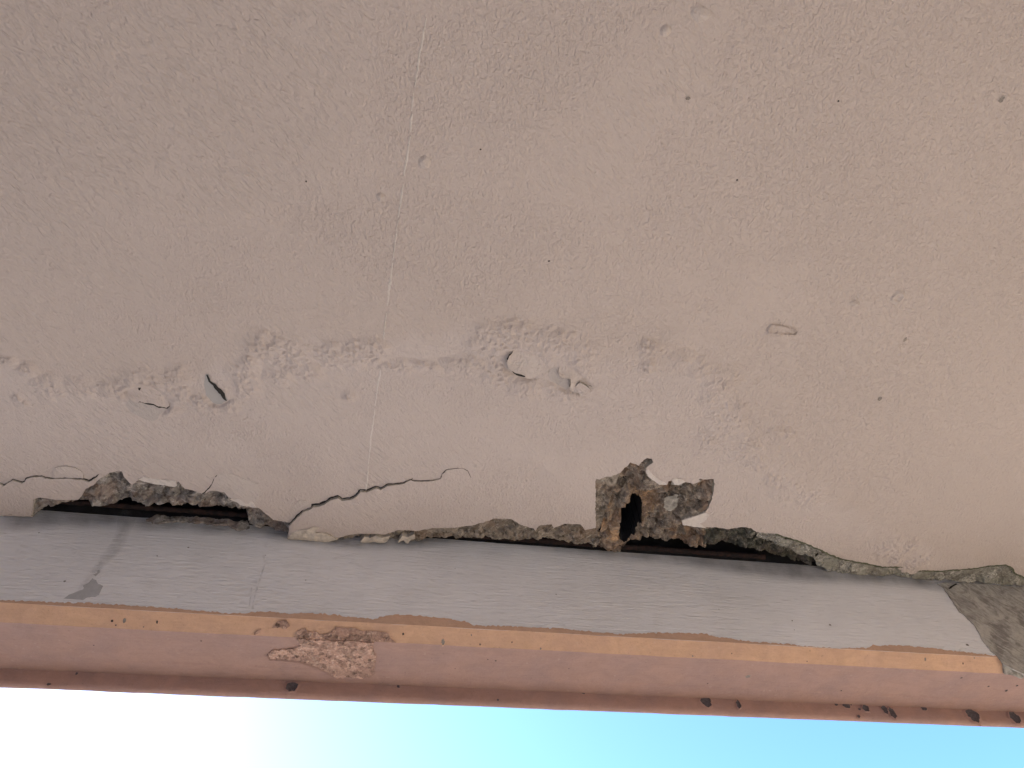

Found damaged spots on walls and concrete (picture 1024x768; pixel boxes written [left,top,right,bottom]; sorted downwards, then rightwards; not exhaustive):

peeling [204,373,233,404]
peeling [504,351,592,397]
crack [1,474,99,485]
crack [289,468,471,524]
peeling [0,458,1024,586]
peeling [254,620,396,679]